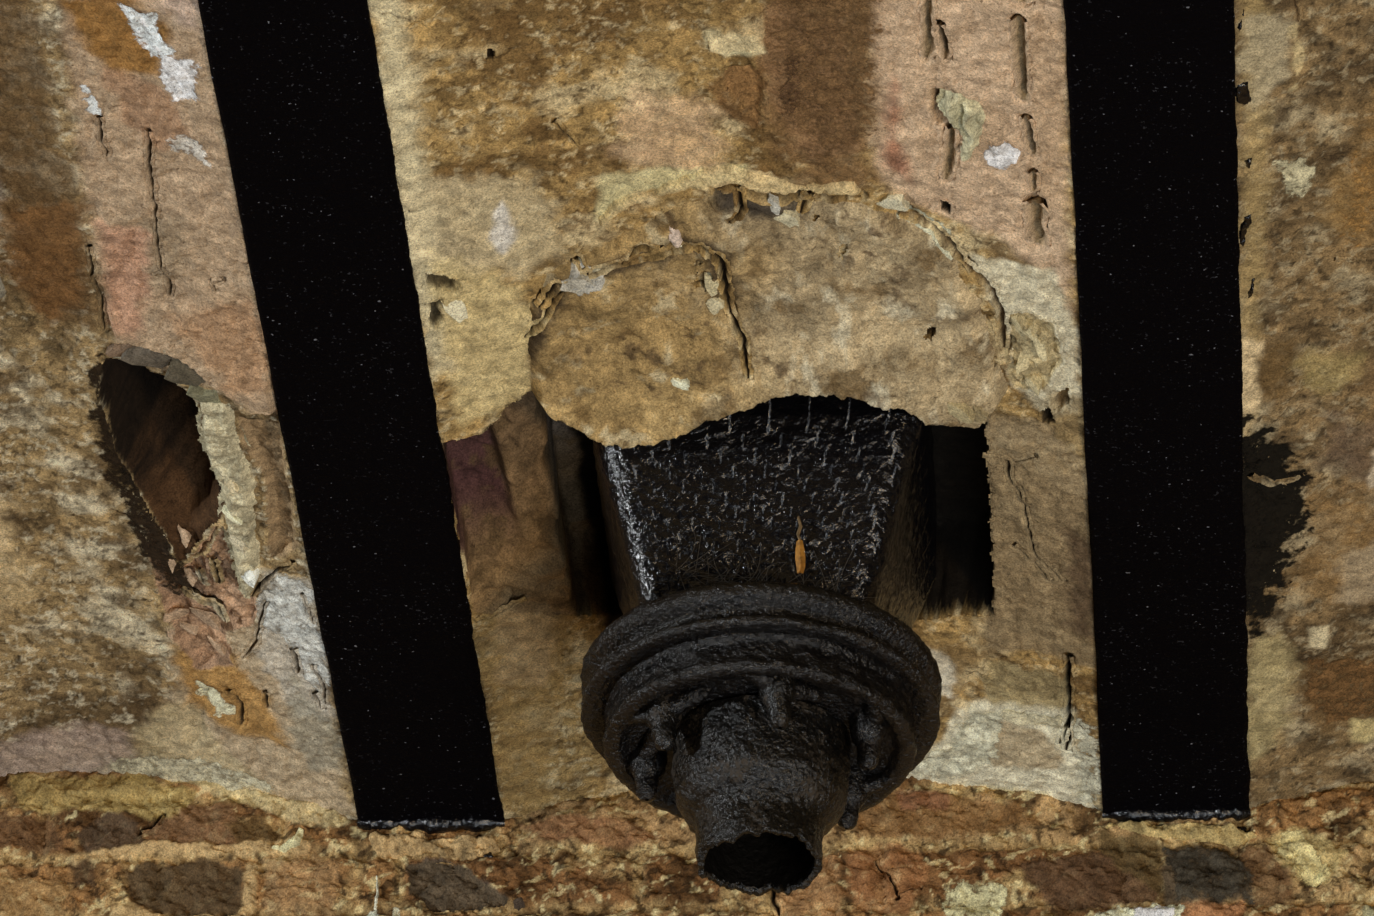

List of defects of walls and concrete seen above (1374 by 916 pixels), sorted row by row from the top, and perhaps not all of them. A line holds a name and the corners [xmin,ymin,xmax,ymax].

crack [95,116,175,297]
crack [210,277,224,292]
flaking render [86,205,302,672]
spalling [442,389,623,629]
spalling [914,414,998,625]
crack [1055,653,1077,752]